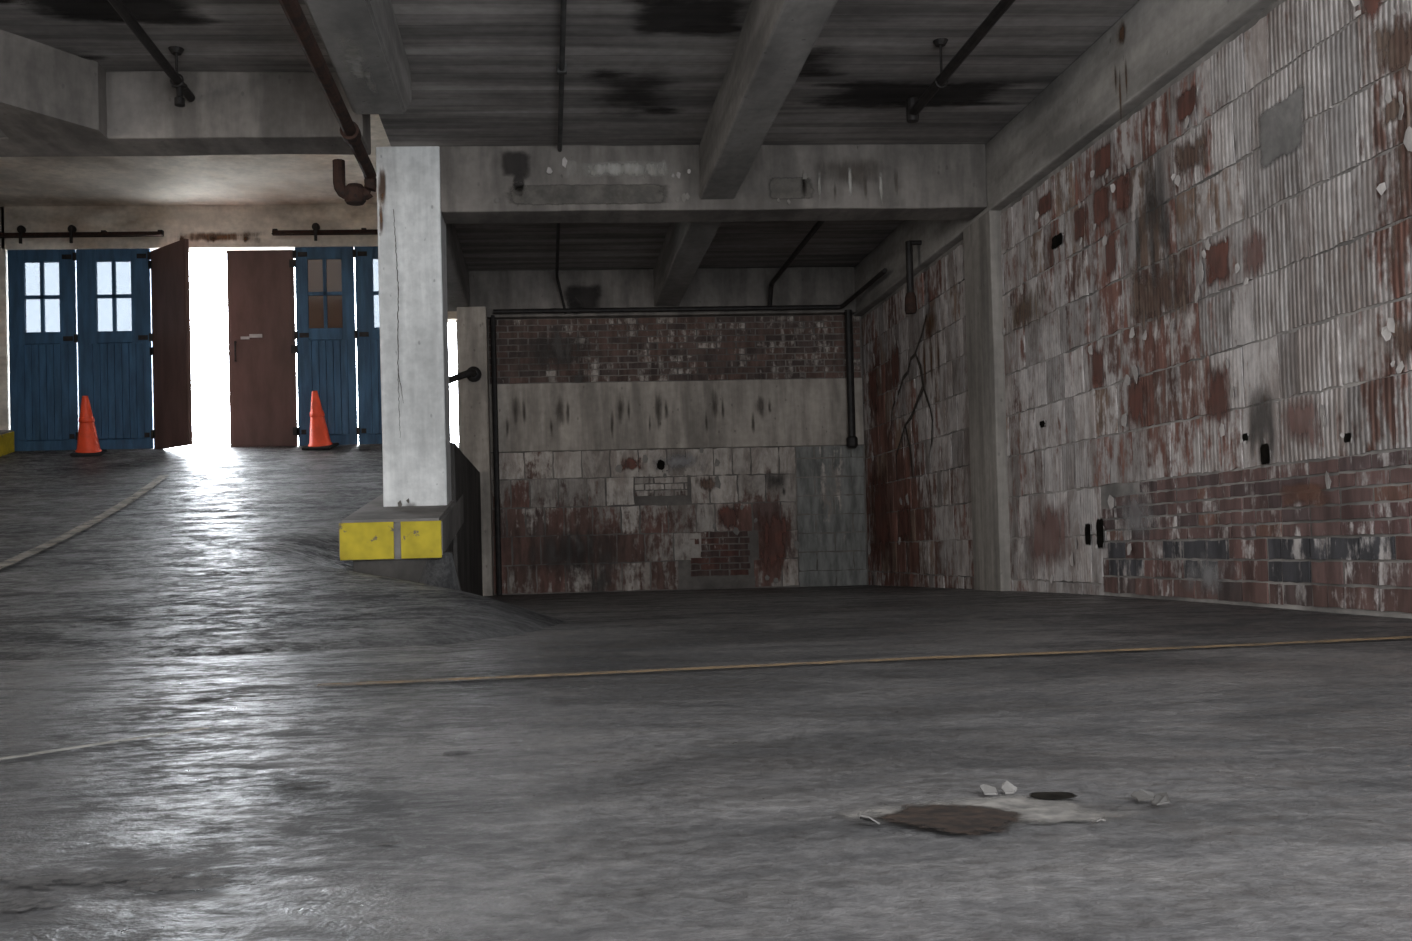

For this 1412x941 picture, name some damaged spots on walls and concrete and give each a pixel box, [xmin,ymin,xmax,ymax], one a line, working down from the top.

damp [634,0,745,34]
peeling [1351,0,1412,75]
peeling [1171,86,1206,186]
peeling [1376,89,1412,195]
peeling [1035,191,1051,220]
peeling [1051,141,1264,341]
peeling [1002,281,1044,335]
peeling [1088,345,1103,396]
peeling [1121,365,1146,427]
peeling [1206,358,1271,465]
peeling [1381,318,1412,374]